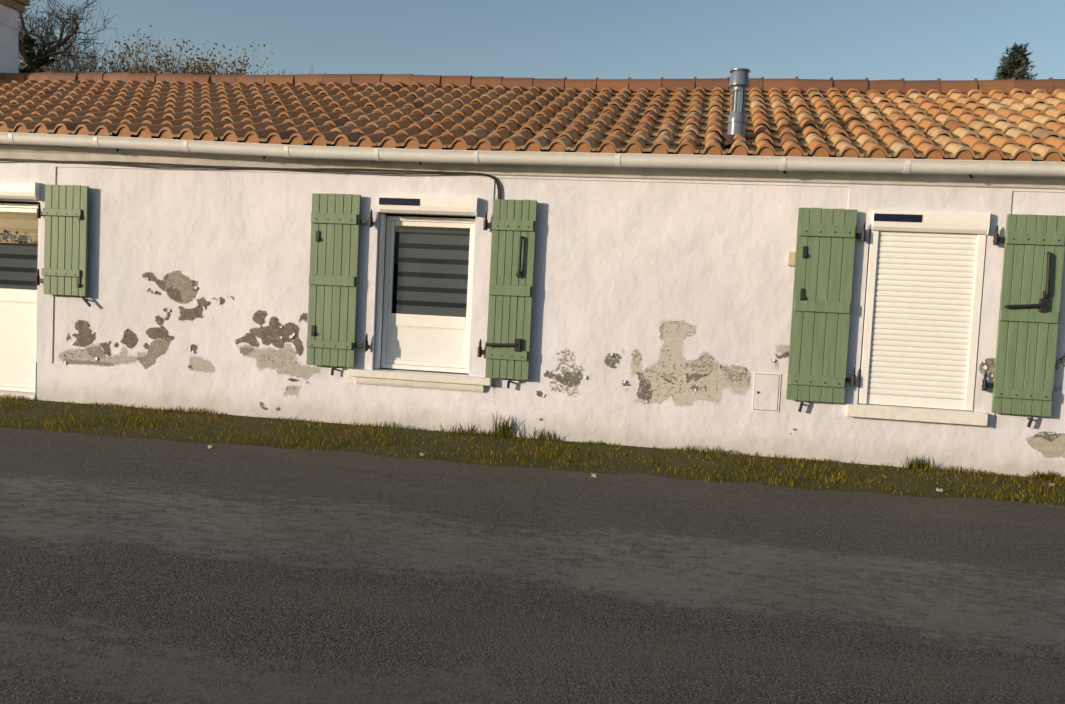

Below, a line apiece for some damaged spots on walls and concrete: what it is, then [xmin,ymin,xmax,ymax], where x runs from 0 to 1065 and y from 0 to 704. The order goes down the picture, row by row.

peeling [59,271,233,372]
peeling [235,310,319,396]
peeling [536,349,586,398]
peeling [604,320,750,406]
flaking render [1026,431,1065,457]